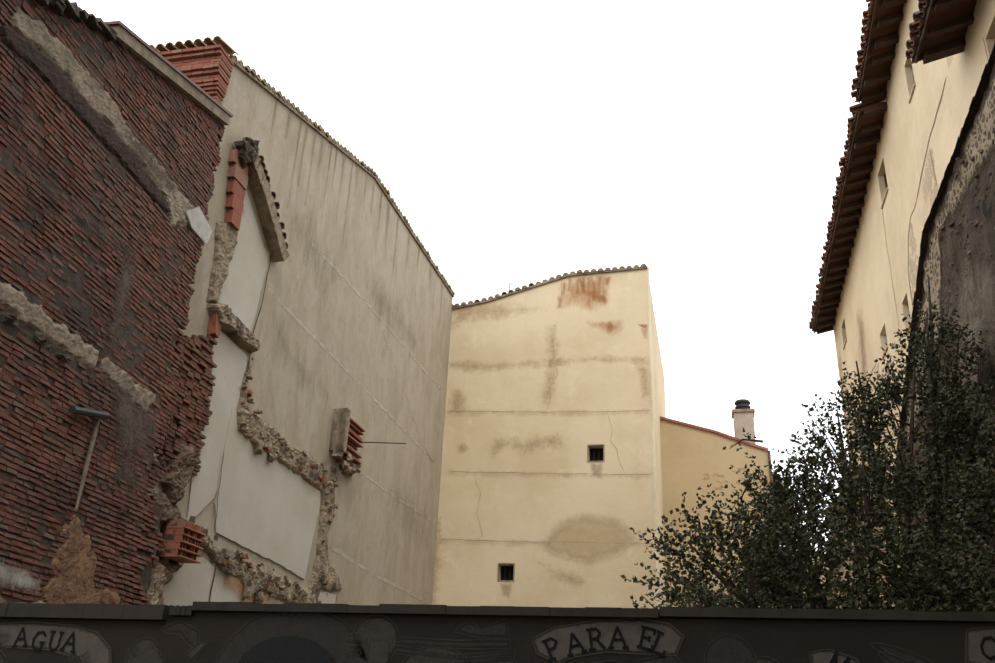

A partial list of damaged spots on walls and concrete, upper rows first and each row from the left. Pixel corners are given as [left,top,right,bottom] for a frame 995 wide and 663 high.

spalling [257,152,288,249]
crack [882,79,946,350]
corrosion [559,278,608,307]
crack [454,333,644,475]
spalling [145,444,198,525]
spalling [200,359,362,603]
crack [448,471,516,542]
peeling [0,566,35,587]